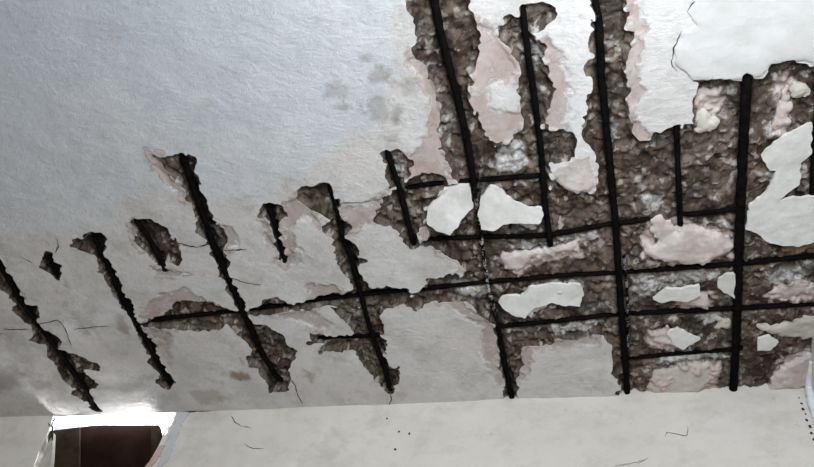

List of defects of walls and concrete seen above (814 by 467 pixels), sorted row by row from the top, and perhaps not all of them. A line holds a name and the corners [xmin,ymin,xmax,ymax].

spalling [39,251,62,280]
spalling [0,260,103,412]
spalling [69,0,814,398]